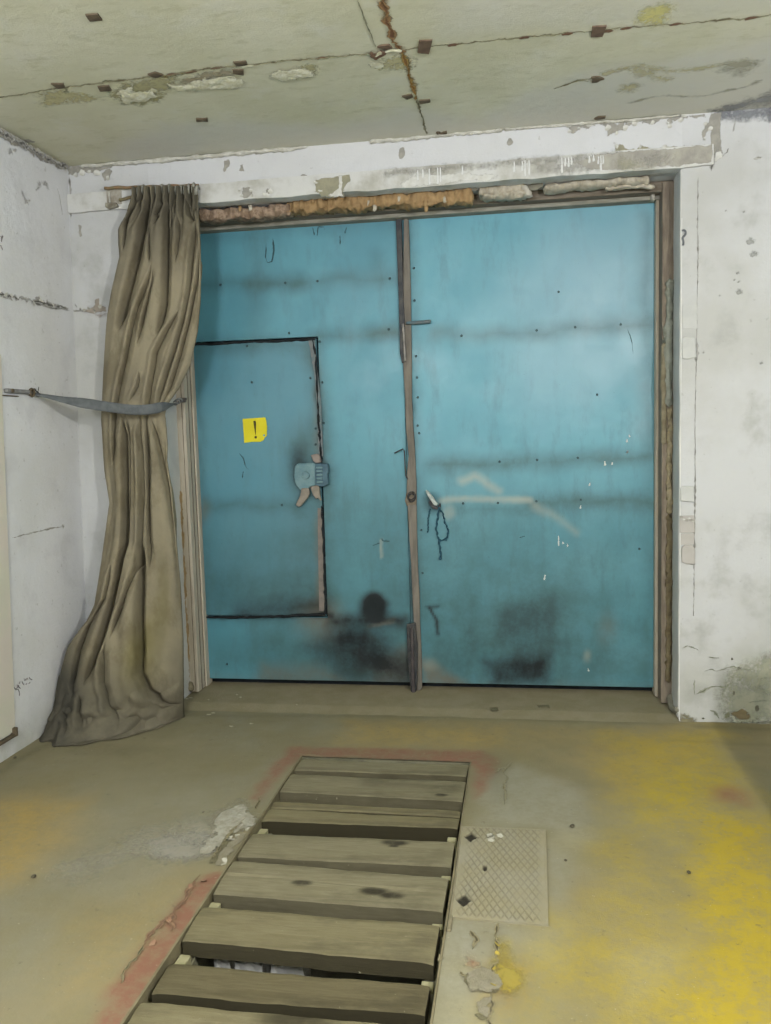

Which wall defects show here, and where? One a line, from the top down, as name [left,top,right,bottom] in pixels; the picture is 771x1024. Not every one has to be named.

crack [403,14,771,50]
rust [378,0,428,134]
peeling [301,174,351,198]
spalling [73,298,106,316]
damp [728,658,771,724]
spalling [302,756,470,766]
spalling [209,797,262,866]
spalling [190,957,215,967]
spalling [311,890,450,1024]